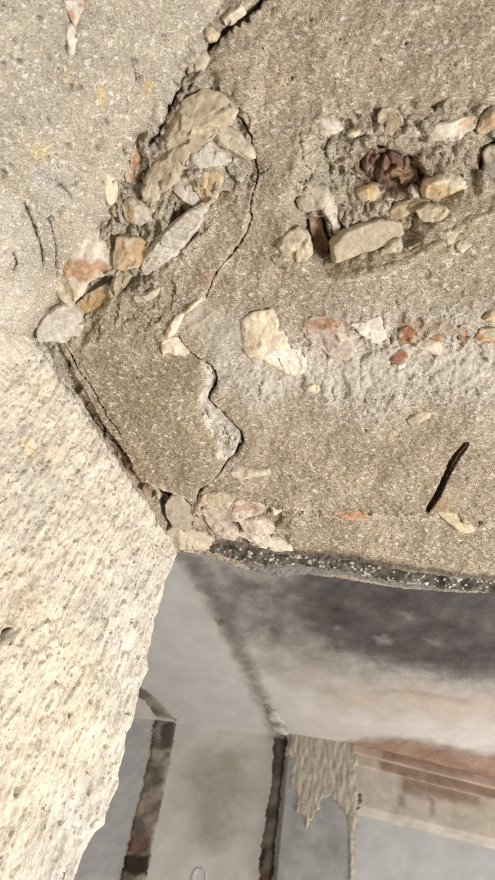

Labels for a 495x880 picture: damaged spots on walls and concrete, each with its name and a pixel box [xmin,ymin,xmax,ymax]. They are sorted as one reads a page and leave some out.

spalling [76,70,216,303]
spalling [185,136,258,245]
crack [210,115,267,287]
rust [359,146,424,197]
spalling [299,105,495,240]
spalling [69,310,97,343]
crack [65,354,126,454]
crack [179,336,244,497]
rust [426,442,469,513]
spalling [162,492,495,594]
peeling [258,704,362,880]